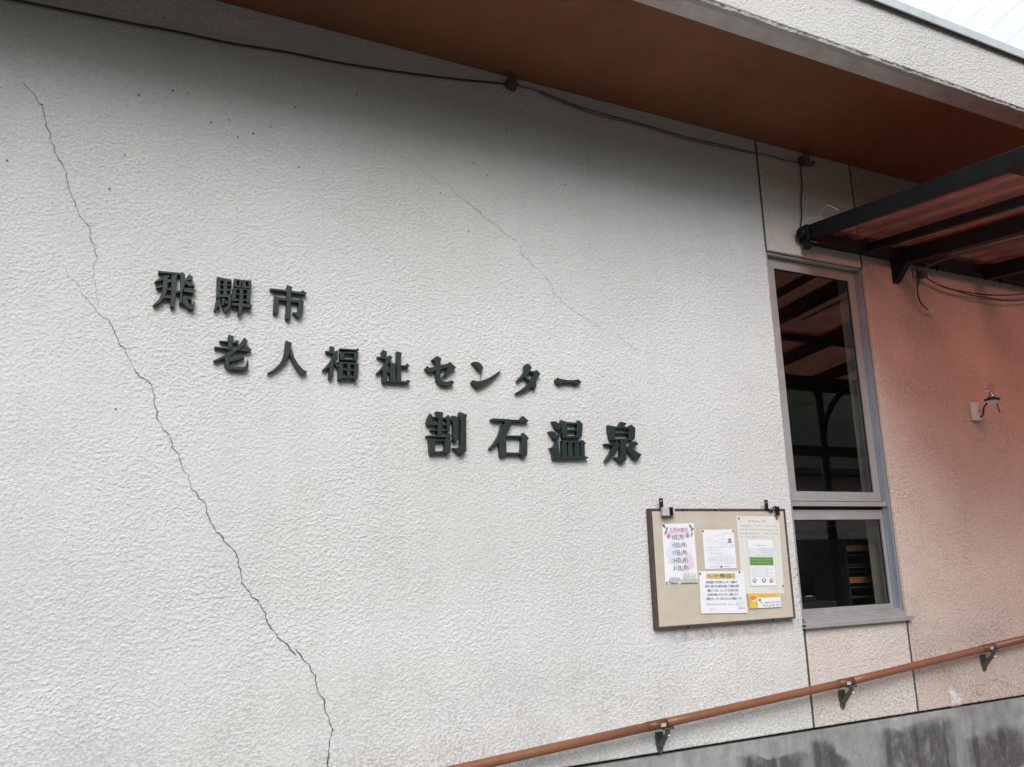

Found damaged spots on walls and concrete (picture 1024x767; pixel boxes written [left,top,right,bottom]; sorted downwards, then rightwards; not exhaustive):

crack [23,82,334,766]